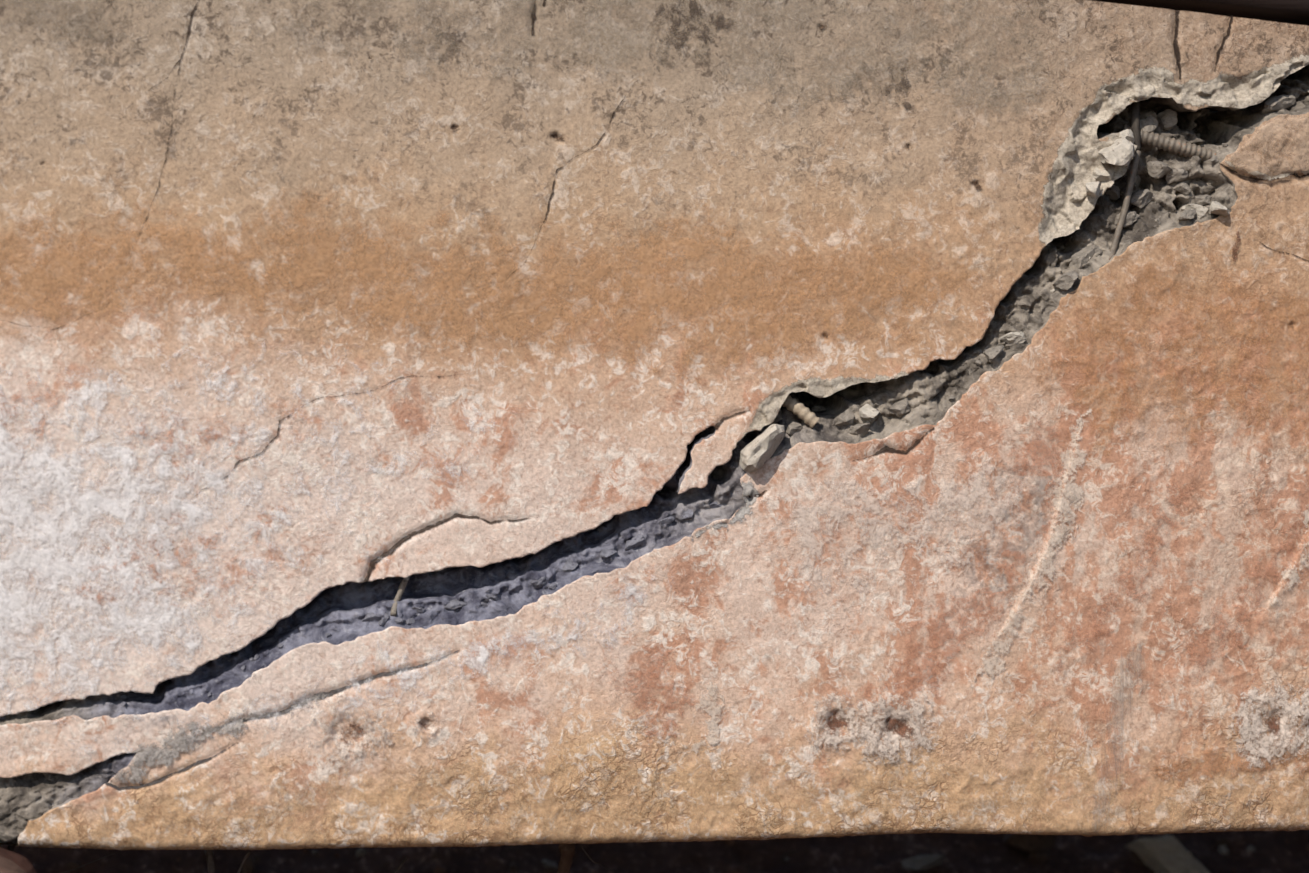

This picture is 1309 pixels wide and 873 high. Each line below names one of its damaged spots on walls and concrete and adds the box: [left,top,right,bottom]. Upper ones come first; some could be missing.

crack [131,2,198,254]
spalling [1038,55,1309,260]
crack [1173,10,1181,79]
crack [1214,15,1233,72]
crack [0,64,1309,724]
leakage [0,376,290,713]
crack [105,650,459,790]
leakage [1228,677,1309,769]